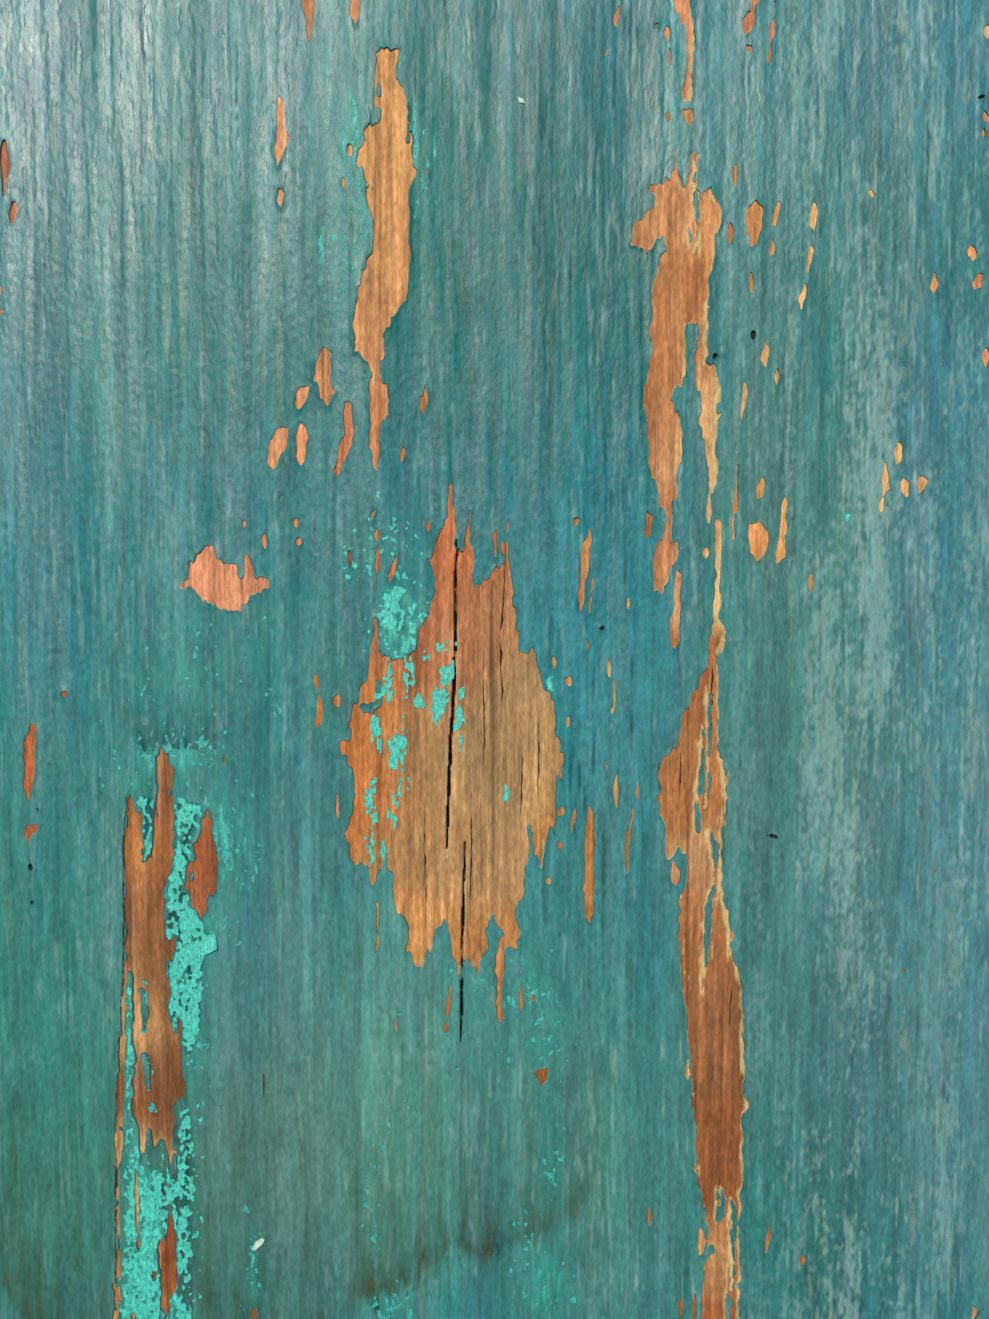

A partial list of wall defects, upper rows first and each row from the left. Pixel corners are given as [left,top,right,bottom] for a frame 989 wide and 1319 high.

peeling [267,46,437,477]
peeling [99,544,269,1319]
peeling [347,1103,391,1249]
peeling [314,482,596,1103]
crack [423,539,540,1043]
peeling [607,660,616,729]
peeling [606,753,639,873]
peeling [630,149,788,1319]